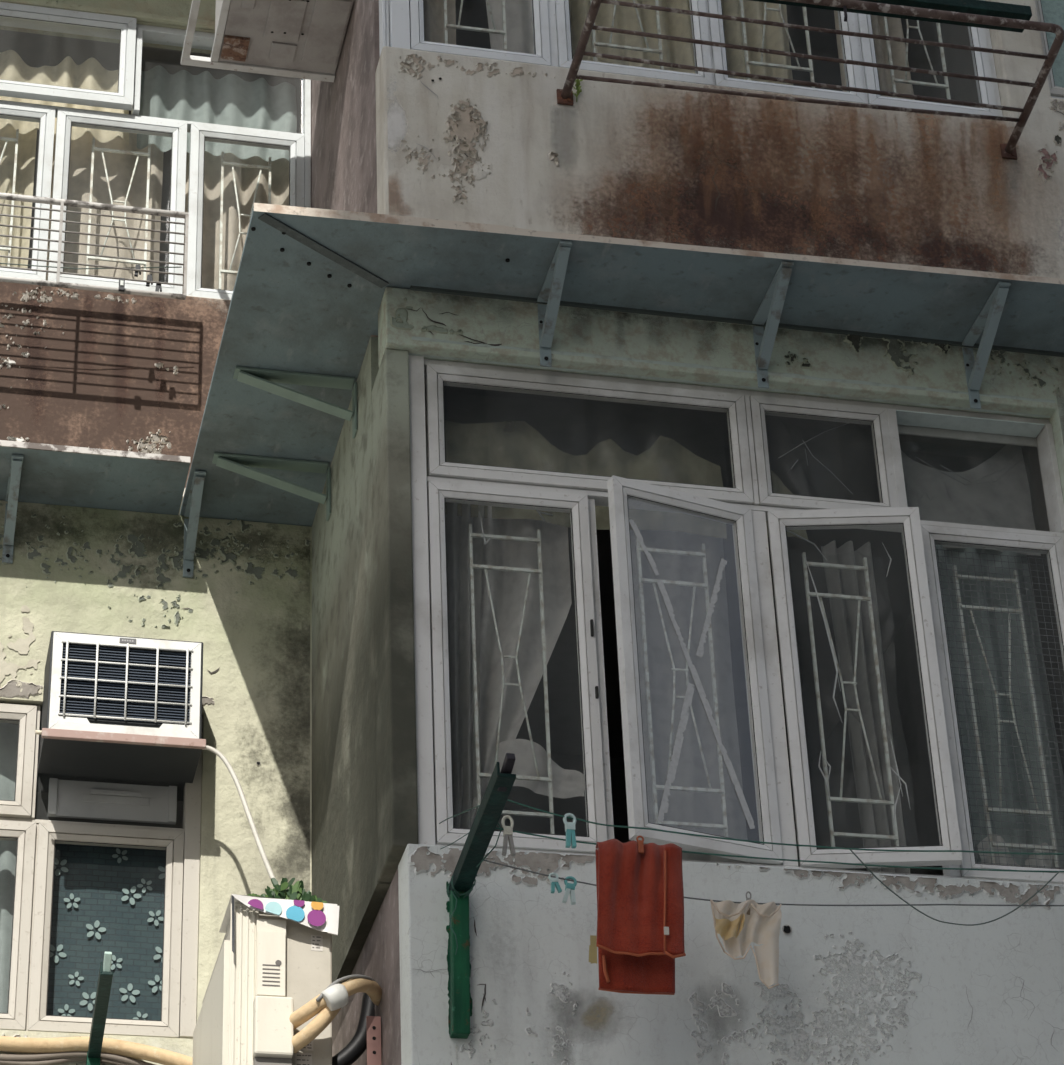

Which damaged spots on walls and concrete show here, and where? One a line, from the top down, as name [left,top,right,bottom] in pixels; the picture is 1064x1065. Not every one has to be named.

peeling [401,98,490,204]
corrosion [580,116,1030,276]
spalling [1036,99,1064,183]
corrosion [0,282,231,488]
peeling [21,514,311,629]
spalling [0,680,43,699]
damp [281,626,310,763]
damp [275,777,310,874]
spalling [783,868,1064,910]
peeling [798,930,922,1065]